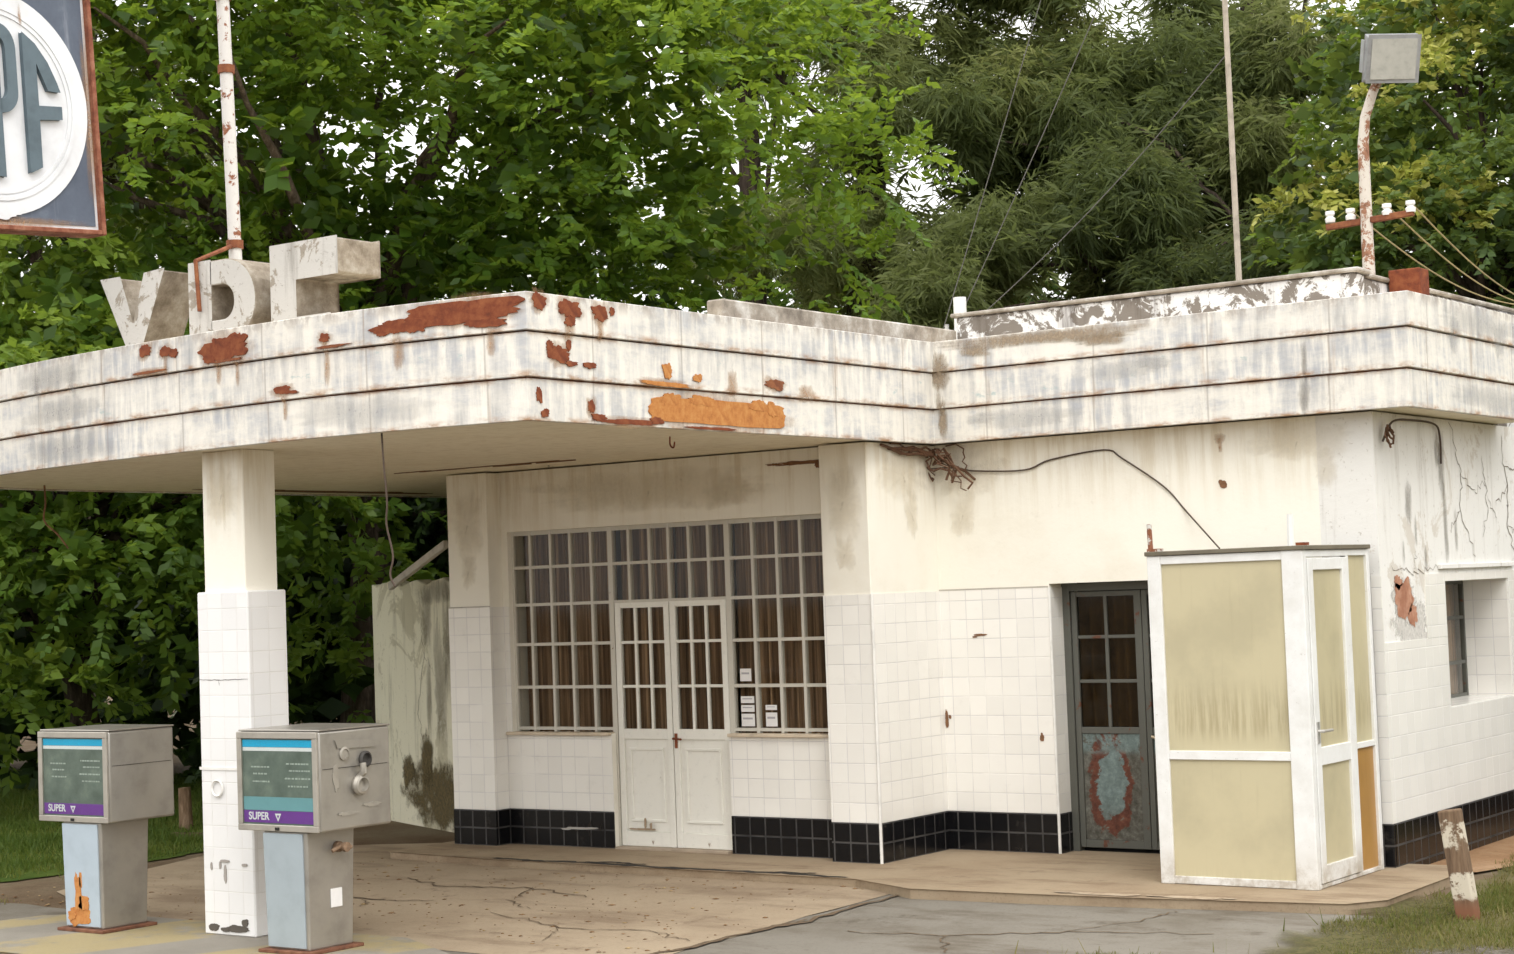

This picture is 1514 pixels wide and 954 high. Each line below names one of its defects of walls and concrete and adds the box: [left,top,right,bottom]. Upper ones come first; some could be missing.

corrosion [316,333,350,375]
corrosion [368,291,615,369]
crack [1448,422,1514,557]
flaking render [1391,575,1427,641]
water stain [403,733,432,789]